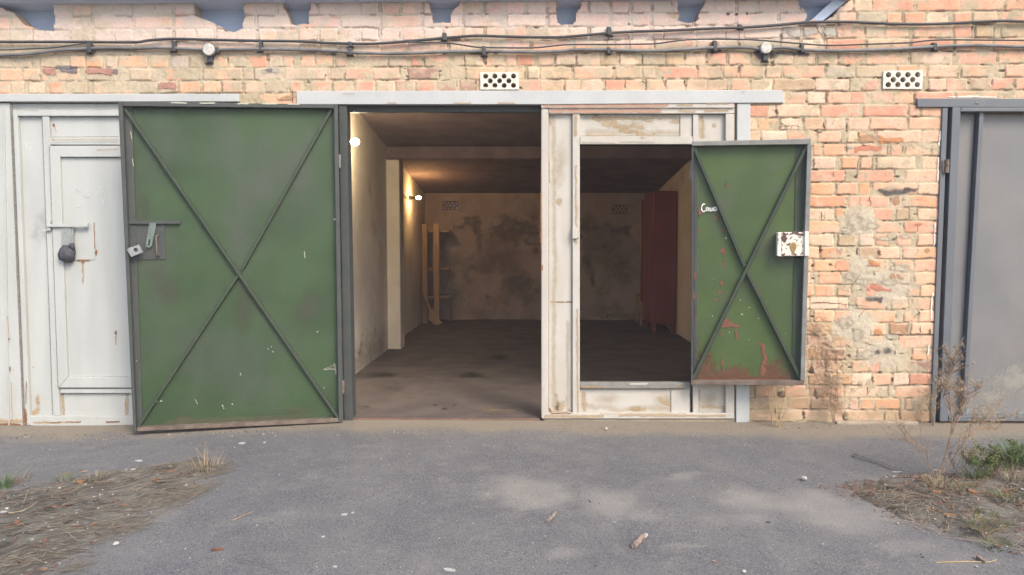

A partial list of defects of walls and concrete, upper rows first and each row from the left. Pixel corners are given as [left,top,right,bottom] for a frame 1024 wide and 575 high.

peeling [711,299,778,376]
rust [0,382,77,425]